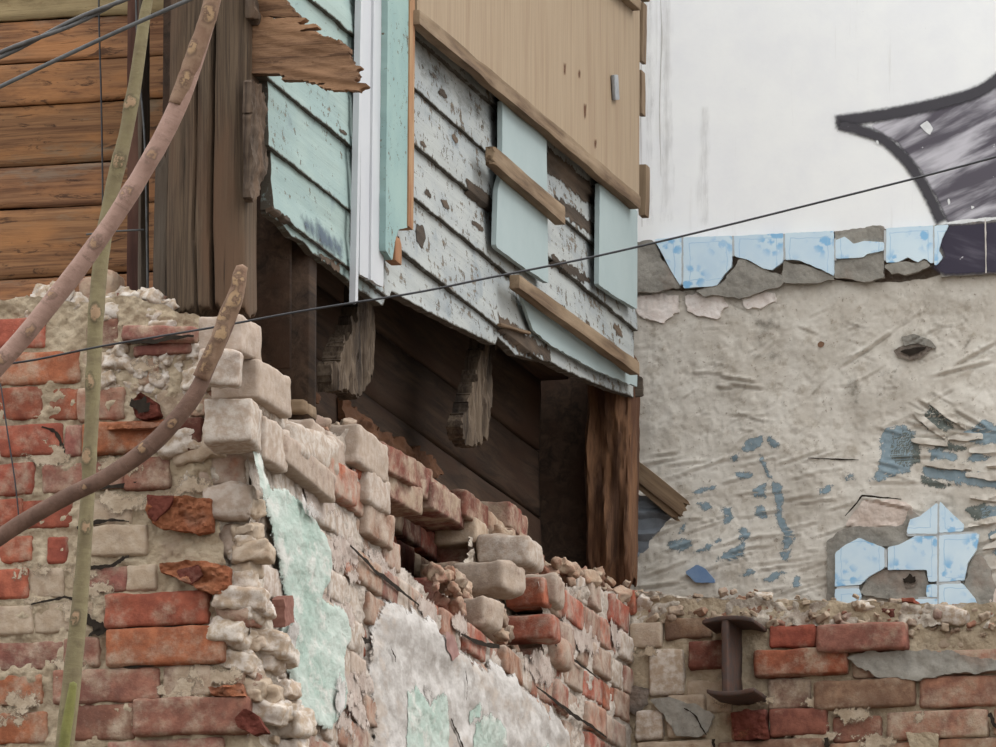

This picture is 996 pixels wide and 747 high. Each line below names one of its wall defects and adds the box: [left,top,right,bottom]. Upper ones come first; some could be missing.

peeling [465,178,492,213]
peeling [547,146,595,239]
peeling [416,224,426,248]
peeling [549,254,591,283]
peeling [636,293,729,324]
peeling [891,420,996,489]
spalling [145,494,215,536]
peeling [668,485,750,562]
peeling [730,455,800,588]
spalling [845,495,913,527]
peeling [253,451,352,730]
peeling [367,600,570,747]